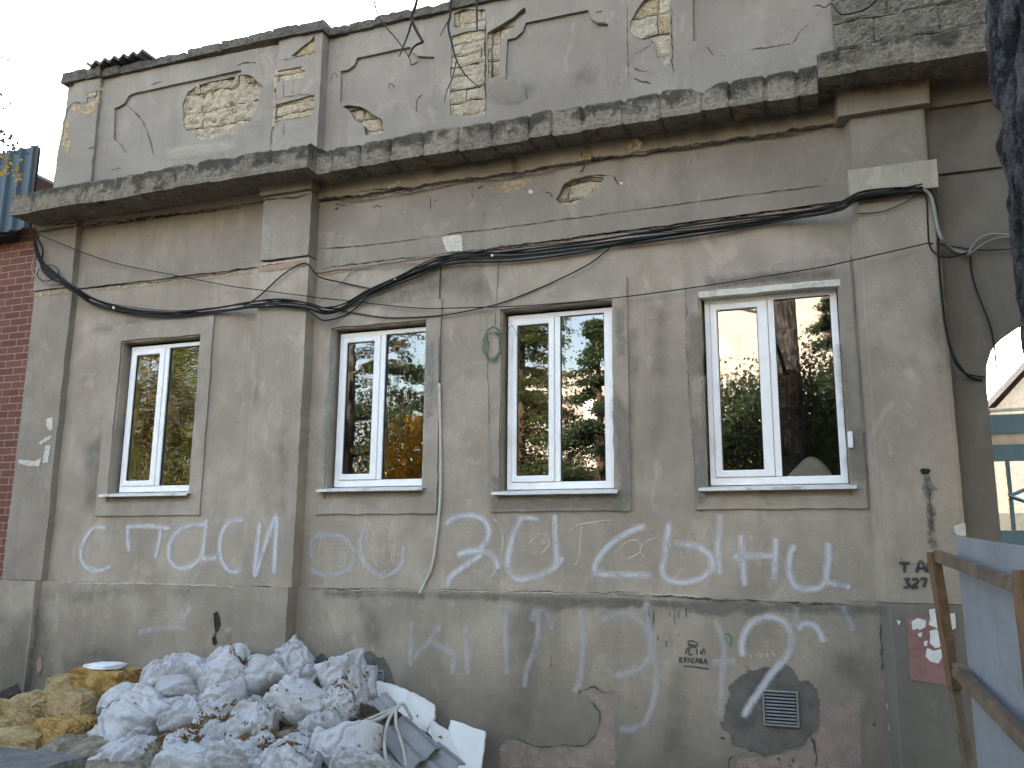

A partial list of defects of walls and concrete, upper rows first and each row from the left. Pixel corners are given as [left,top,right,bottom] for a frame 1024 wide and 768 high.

flaking render [62,86,105,154]
flaking render [181,39,315,140]
flaking render [346,108,384,135]
flaking render [450,10,526,116]
flaking render [630,0,671,68]
crack [40,123,835,270]
flaking render [558,177,603,206]
peeling [501,695,615,768]